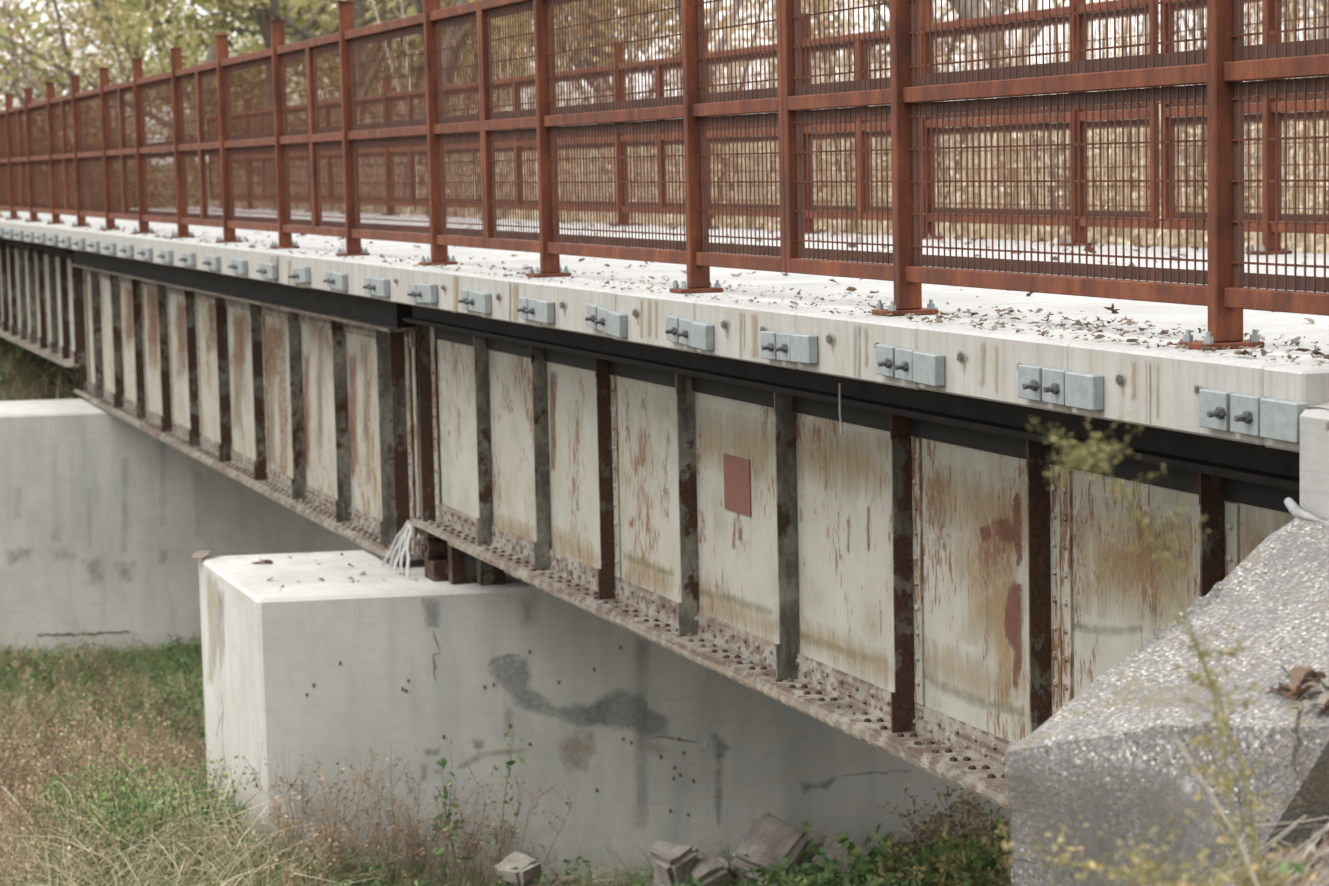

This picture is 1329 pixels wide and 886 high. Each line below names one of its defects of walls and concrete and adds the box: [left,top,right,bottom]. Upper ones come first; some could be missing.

rust [124,288,187,371]